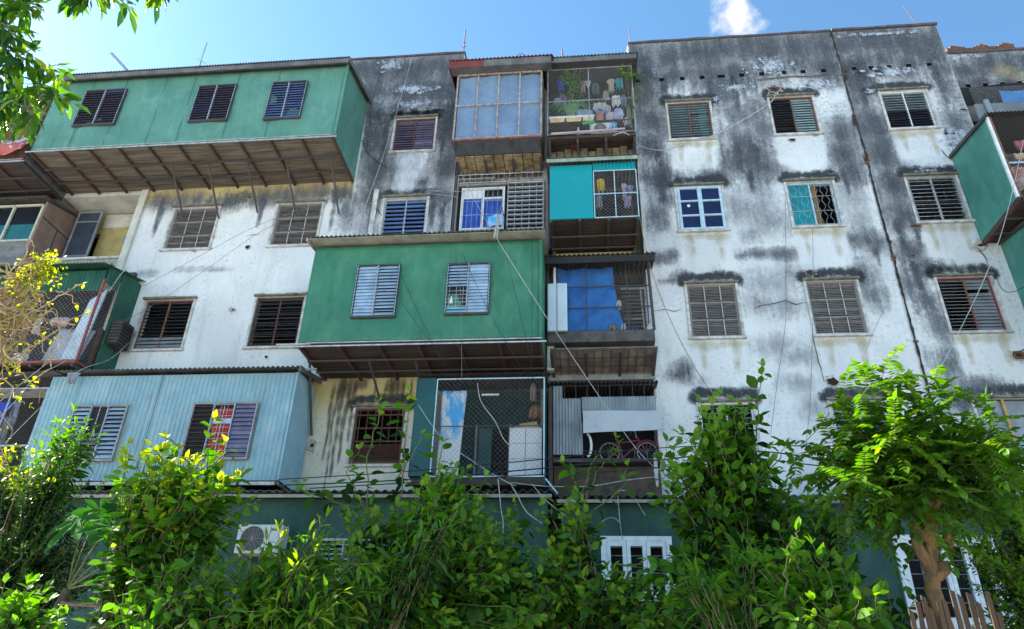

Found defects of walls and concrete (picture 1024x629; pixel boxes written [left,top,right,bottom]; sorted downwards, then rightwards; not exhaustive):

leakage [148,54,464,233]
peeling [395,84,441,108]
peeling [713,56,795,101]
leakage [629,26,1024,427]
leakage [323,378,415,486]